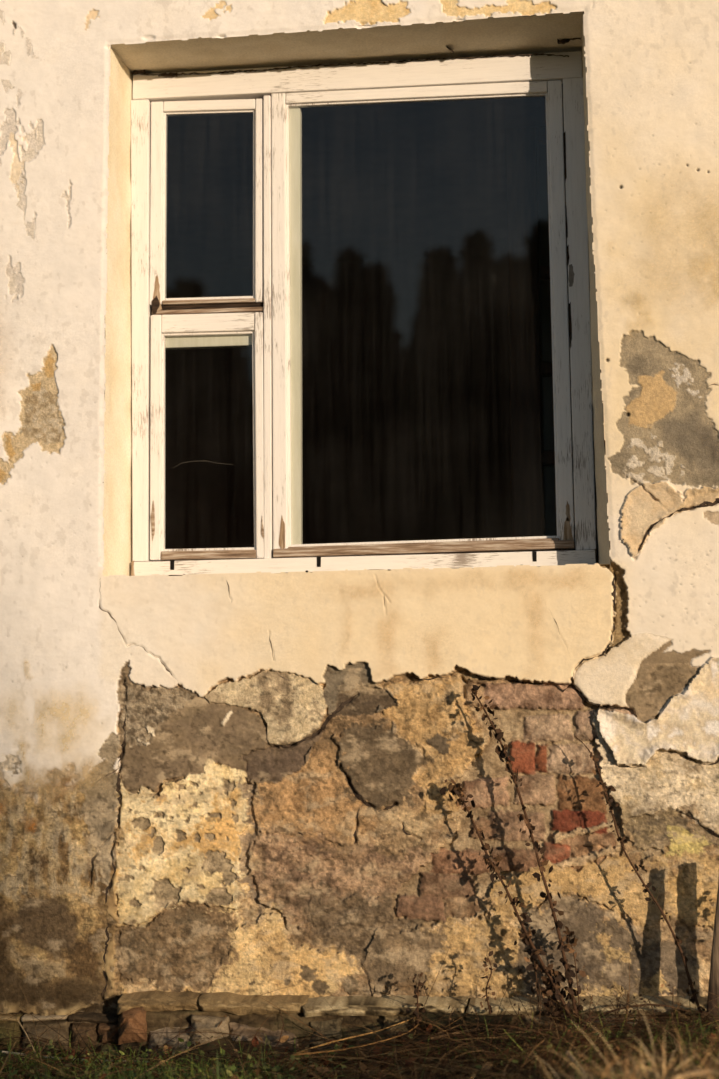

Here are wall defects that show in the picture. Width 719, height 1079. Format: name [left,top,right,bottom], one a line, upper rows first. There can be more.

peeling [325,0,410,25]
peeling [441,0,557,18]
peeling [0,80,45,239]
peeling [61,184,72,228]
peeling [6,257,25,302]
peeling [0,345,66,485]
peeling [608,331,719,489]
peeling [704,512,719,525]
crack [99,585,172,675]
flaking render [0,633,719,1060]